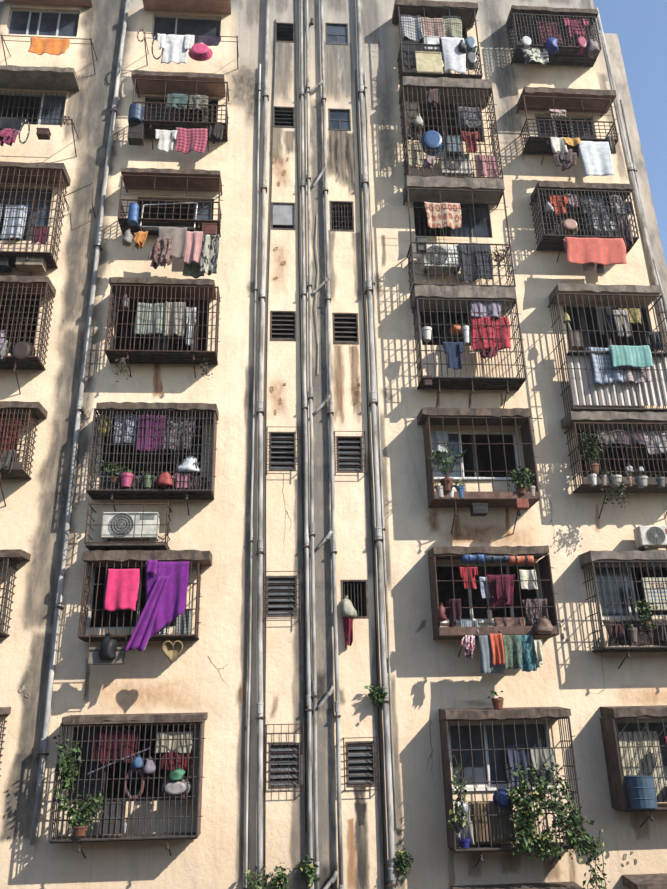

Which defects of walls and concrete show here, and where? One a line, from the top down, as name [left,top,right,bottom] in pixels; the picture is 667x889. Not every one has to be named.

water stain [1,0,129,840]
rust [154,364,162,394]
water stain [291,104,355,889]
rust [335,346,359,417]
water stain [365,417,388,574]
rust [455,510,485,541]
water stain [354,786,368,889]
water stain [372,638,405,889]